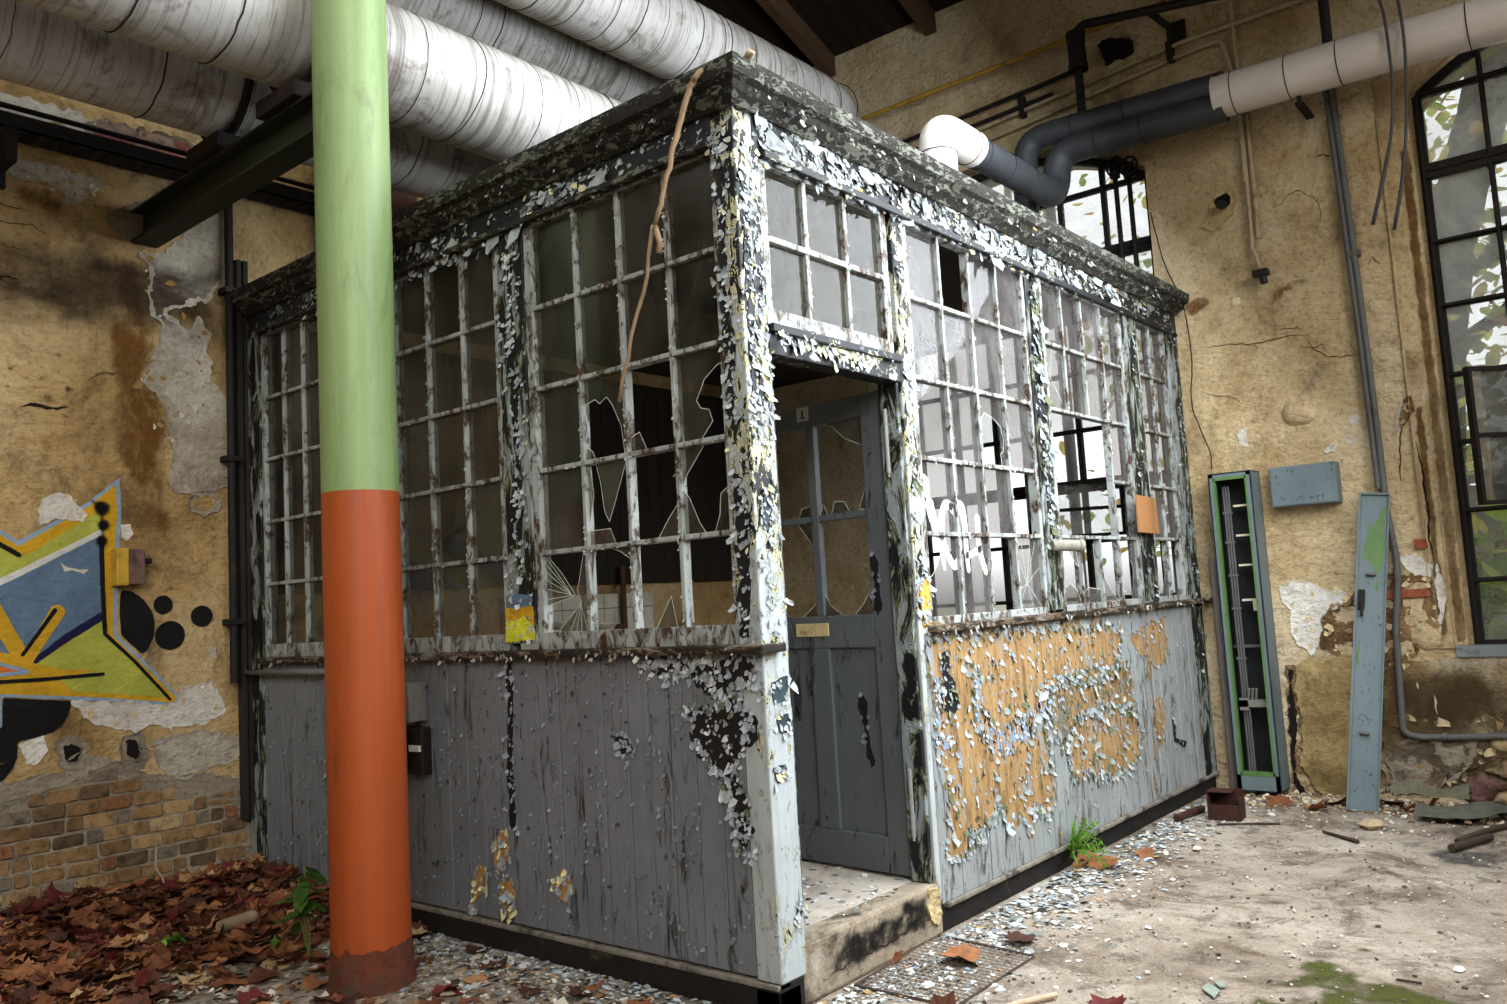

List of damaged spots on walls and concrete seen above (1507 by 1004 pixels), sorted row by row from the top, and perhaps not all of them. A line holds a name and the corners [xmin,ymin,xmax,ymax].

crack [0,203,46,281]
crack [21,372,135,410]
damp [113,309,164,487]
flaking render [133,211,227,498]
flaking render [37,492,88,525]
flaking render [120,524,133,540]
peeling [393,87,1210,965]
flaking render [1381,553,1507,797]
flaking render [0,681,252,911]
peeling [817,580,1354,1004]
peeling [383,930,713,1004]